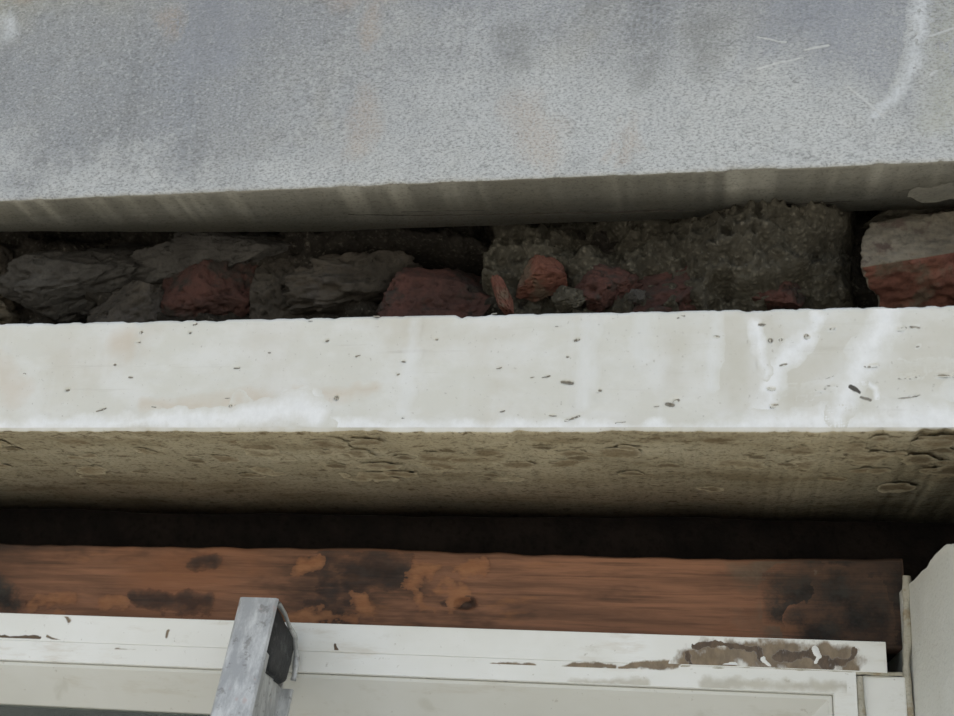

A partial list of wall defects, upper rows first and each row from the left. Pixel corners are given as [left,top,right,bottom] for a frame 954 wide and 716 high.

water stain [484,0,954,148]
water stain [908,182,954,203]
peeling [669,636,870,671]